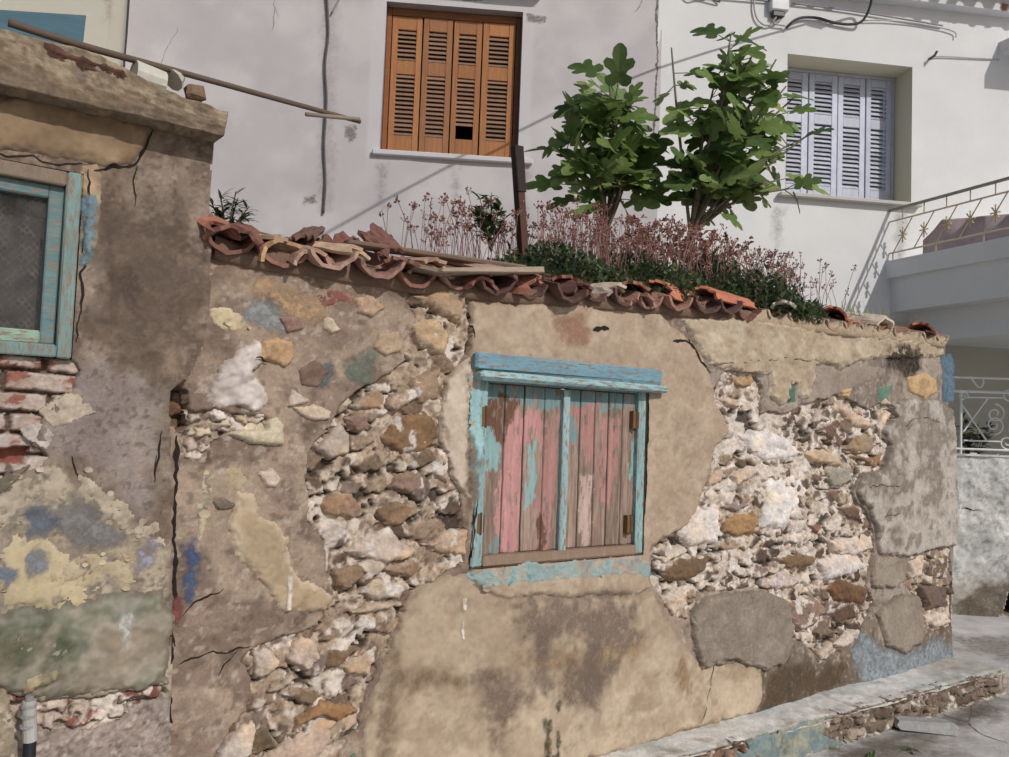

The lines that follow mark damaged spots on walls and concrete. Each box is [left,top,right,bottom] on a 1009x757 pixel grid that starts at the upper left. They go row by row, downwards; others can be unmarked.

spalling [44,42,128,78]
crack [0,130,153,343]
peeling [80,195,98,265]
spalling [0,670,164,741]
spalling [0,354,166,592]
crack [154,431,250,676]
spalling [169,390,284,623]
water stain [513,592,638,711]
spalling [210,278,999,757]